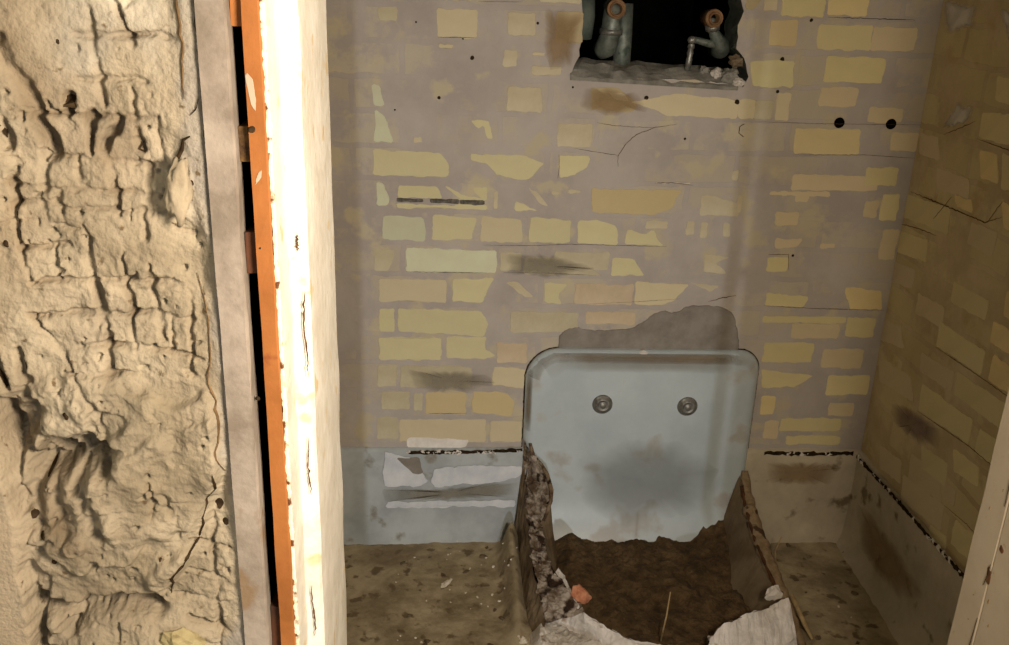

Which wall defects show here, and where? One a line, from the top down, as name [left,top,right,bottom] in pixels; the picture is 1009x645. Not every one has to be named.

peeling [436,0,478,49]
peeling [506,52,562,113]
peeling [540,0,584,43]
damp [550,21,574,60]
damp [593,94,633,111]
peeling [745,0,918,108]
peeling [259,0,300,645]
peeling [371,84,729,488]
peeling [591,59,1009,573]
crack [170,273,225,593]
peeling [386,499,516,508]